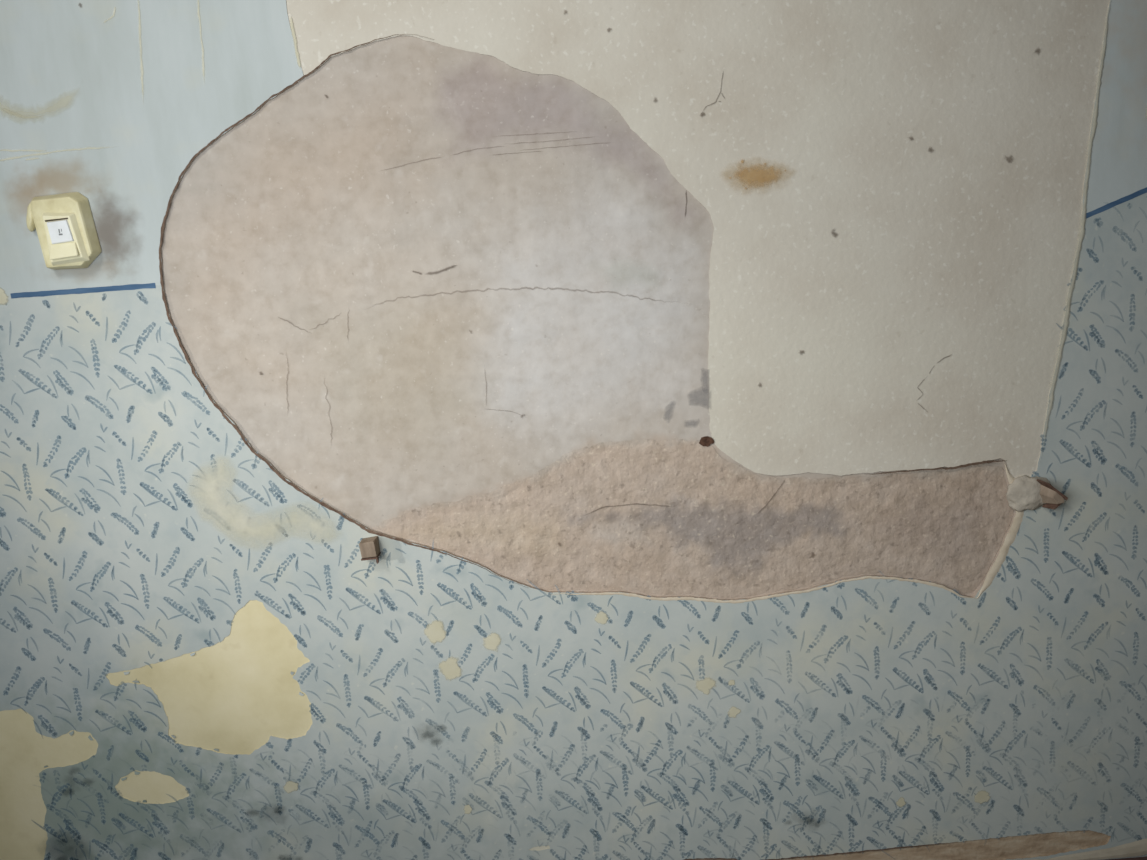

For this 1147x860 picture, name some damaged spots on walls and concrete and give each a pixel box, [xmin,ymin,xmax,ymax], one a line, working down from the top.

spalling [159,0,1110,604]
peeling [105,600,312,755]
peeling [0,708,98,860]
peeling [115,770,189,804]
spalling [766,830,1111,860]